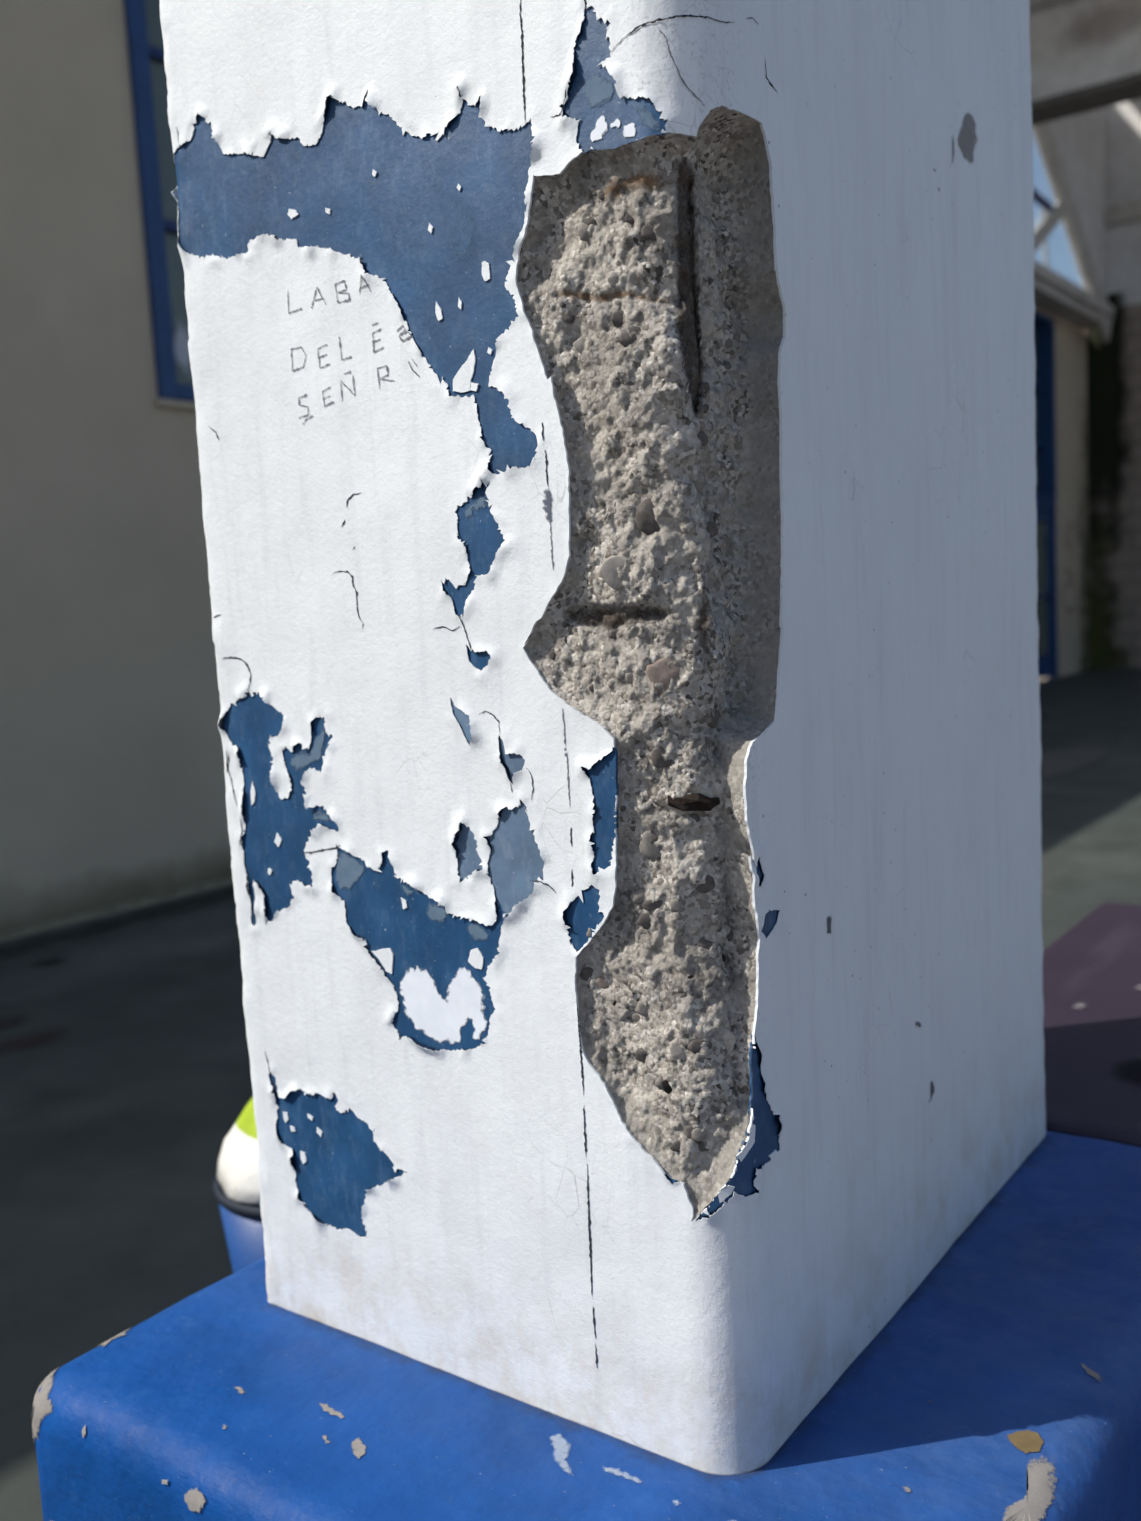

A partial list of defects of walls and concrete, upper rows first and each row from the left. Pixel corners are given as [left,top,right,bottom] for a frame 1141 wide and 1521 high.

crack [519,0,566,119]
crack [612,14,757,105]
crack [541,422,554,567]
spalling [175,3,783,1237]
crack [510,708,573,893]
crack [576,998,598,1367]
peeling [31,1367,59,1442]
peeling [184,1488,205,1512]
peeling [319,1403,344,1418]
peeling [351,1438,366,1458]
peeling [1003,1429,1056,1521]